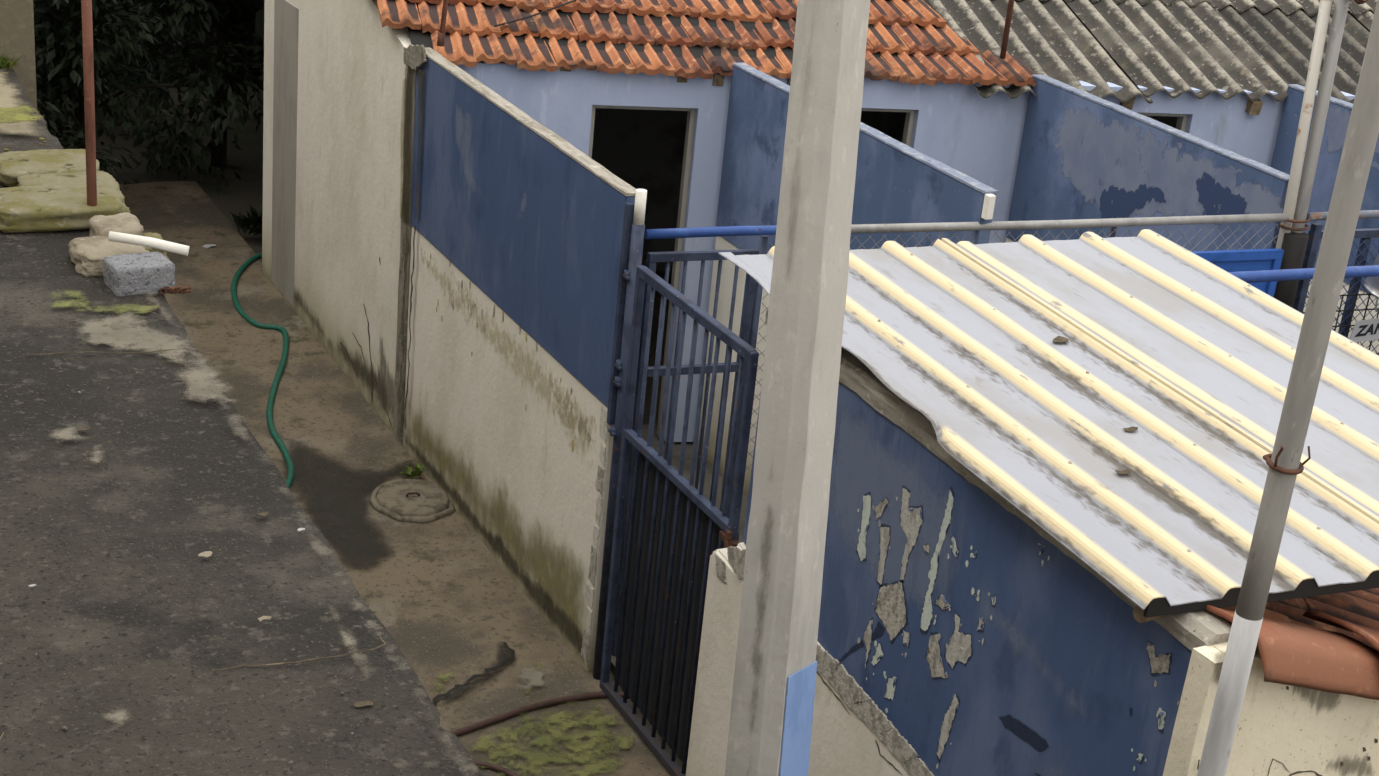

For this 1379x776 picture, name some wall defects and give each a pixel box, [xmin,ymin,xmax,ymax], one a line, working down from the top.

water stain [341,347,405,423]
peeling [816,485,996,776]
peeling [1146,641,1185,687]
peeling [1156,701,1179,733]
crack [1268,759,1322,776]